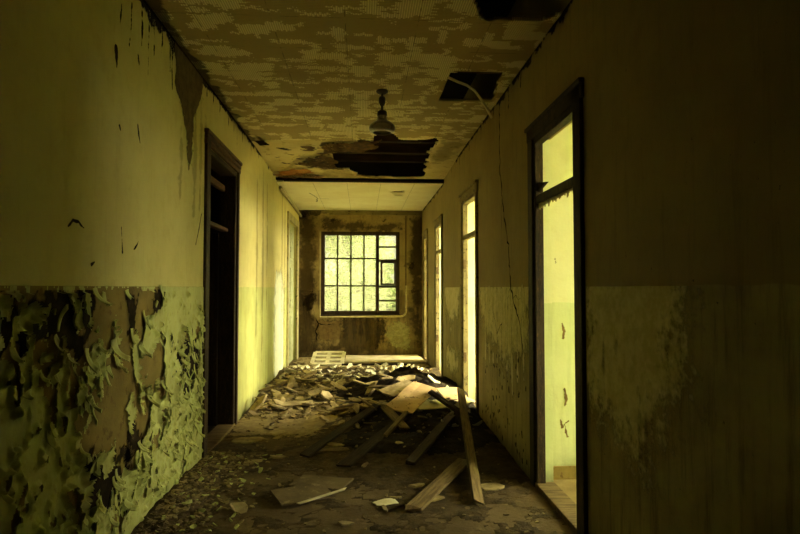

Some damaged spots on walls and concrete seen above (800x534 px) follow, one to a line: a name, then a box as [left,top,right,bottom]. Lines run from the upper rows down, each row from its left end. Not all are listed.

water stain [120,0,261,158]
spalling [276,138,383,170]
water stain [299,180,444,355]
crack [493,105,523,352]
water stain [451,0,573,170]
peeling [0,285,206,534]